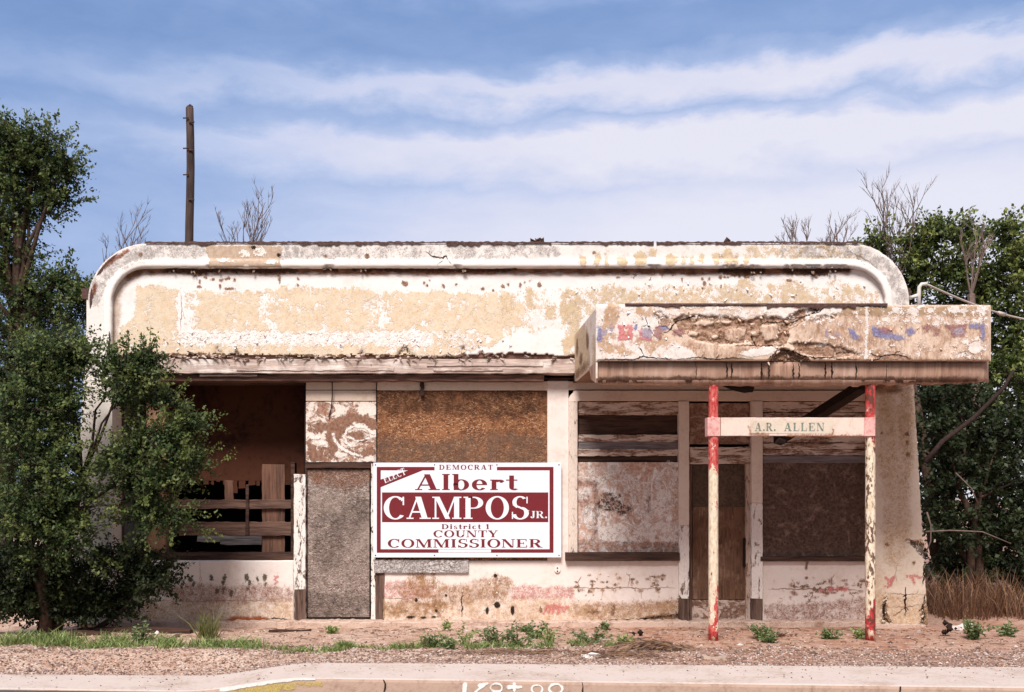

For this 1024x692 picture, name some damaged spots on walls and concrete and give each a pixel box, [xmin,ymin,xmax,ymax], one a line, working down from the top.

peeling [117,245,990,380]
crack [598,309,911,361]
peeling [307,413,377,462]
spalling [906,539,936,558]
crack [882,564,926,623]